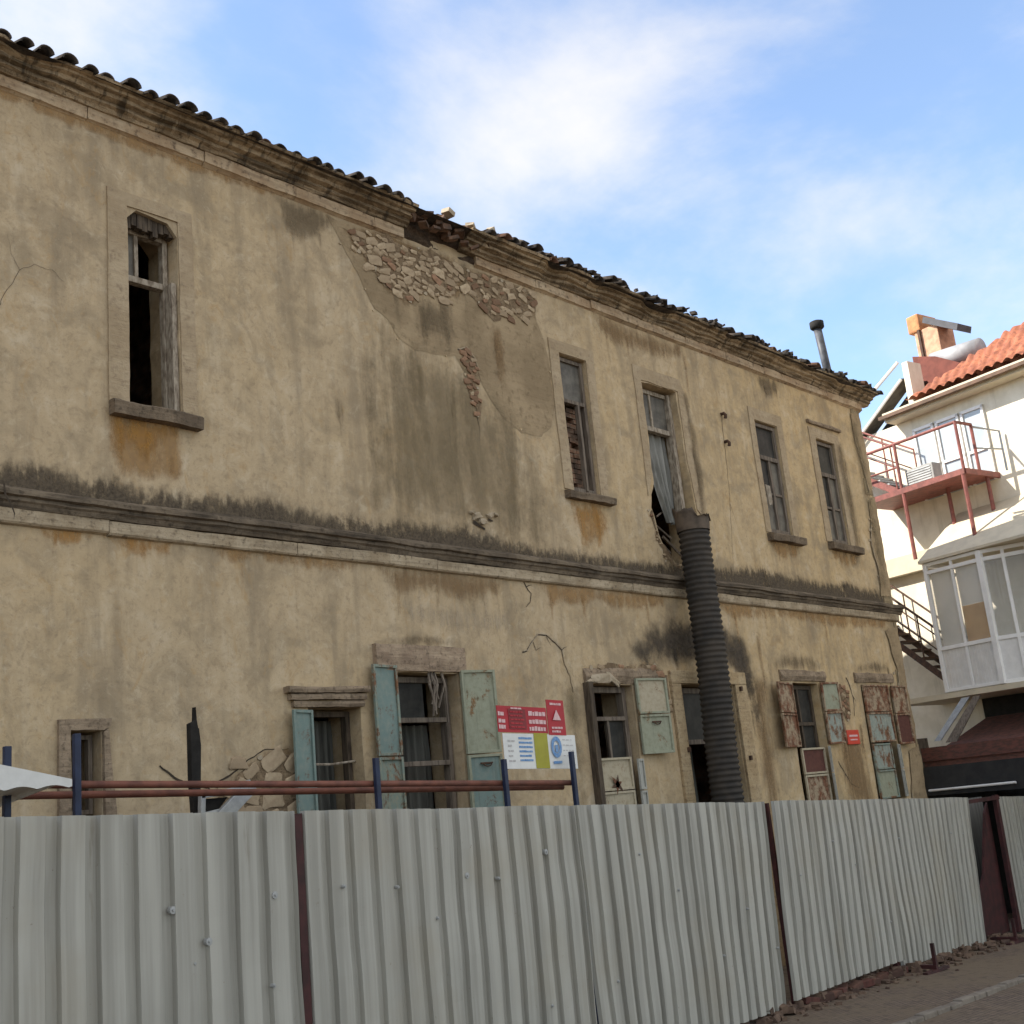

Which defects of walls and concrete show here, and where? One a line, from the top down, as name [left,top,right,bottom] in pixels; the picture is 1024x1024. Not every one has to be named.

peeling [326,214,555,437]
leakage [396,377,516,520]
leakage [0,465,684,576]
leakage [714,568,884,603]
crack [522,633,574,689]
spalling [218,744,297,814]